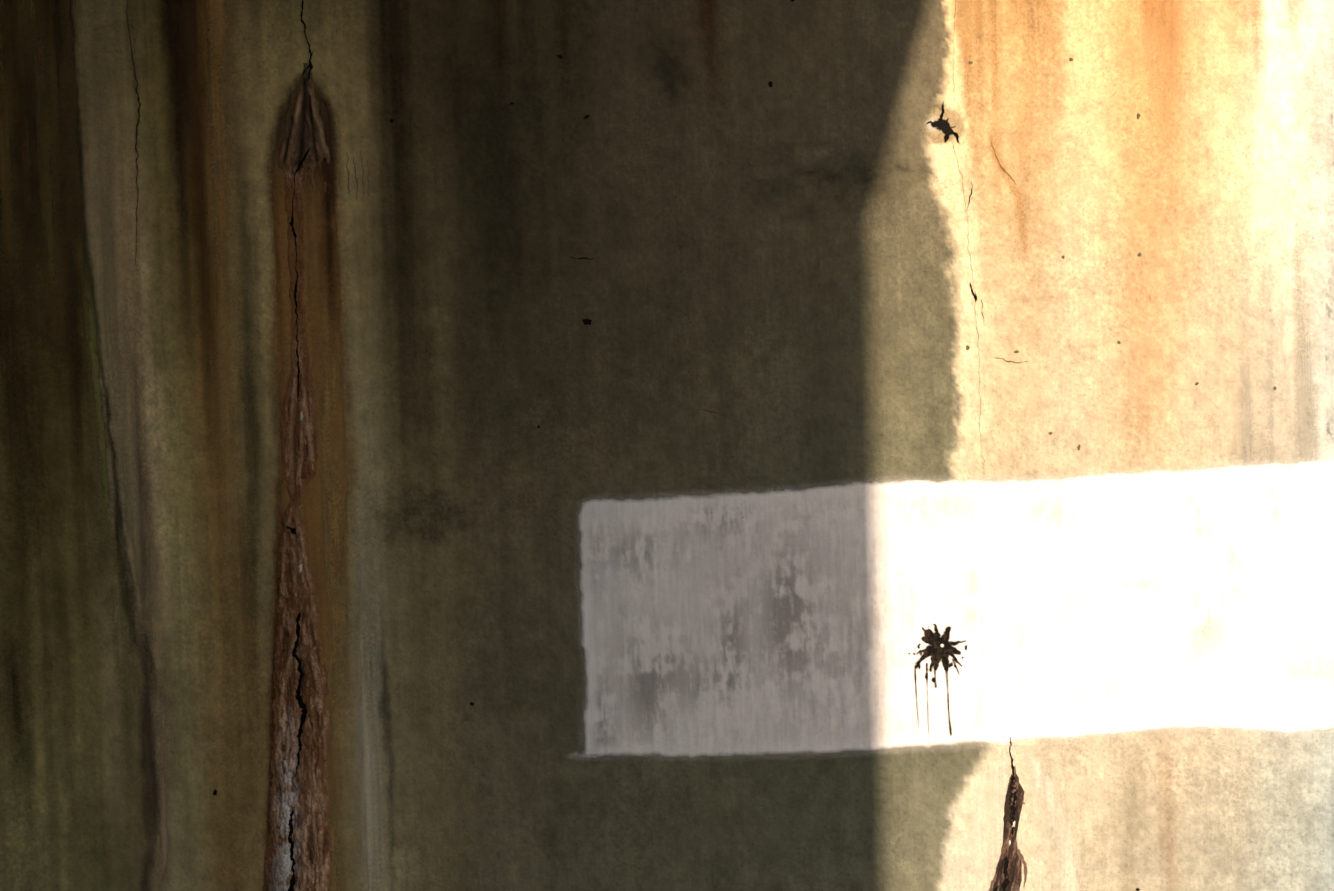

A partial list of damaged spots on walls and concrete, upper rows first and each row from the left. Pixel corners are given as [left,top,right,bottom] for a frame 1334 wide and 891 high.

crack [300,0,314,80]
rust [956,0,997,116]
rust [1141,0,1185,139]
water stain [0,0,157,652]
rust [271,79,349,891]
water stain [142,668,170,891]
rust [265,570,279,855]